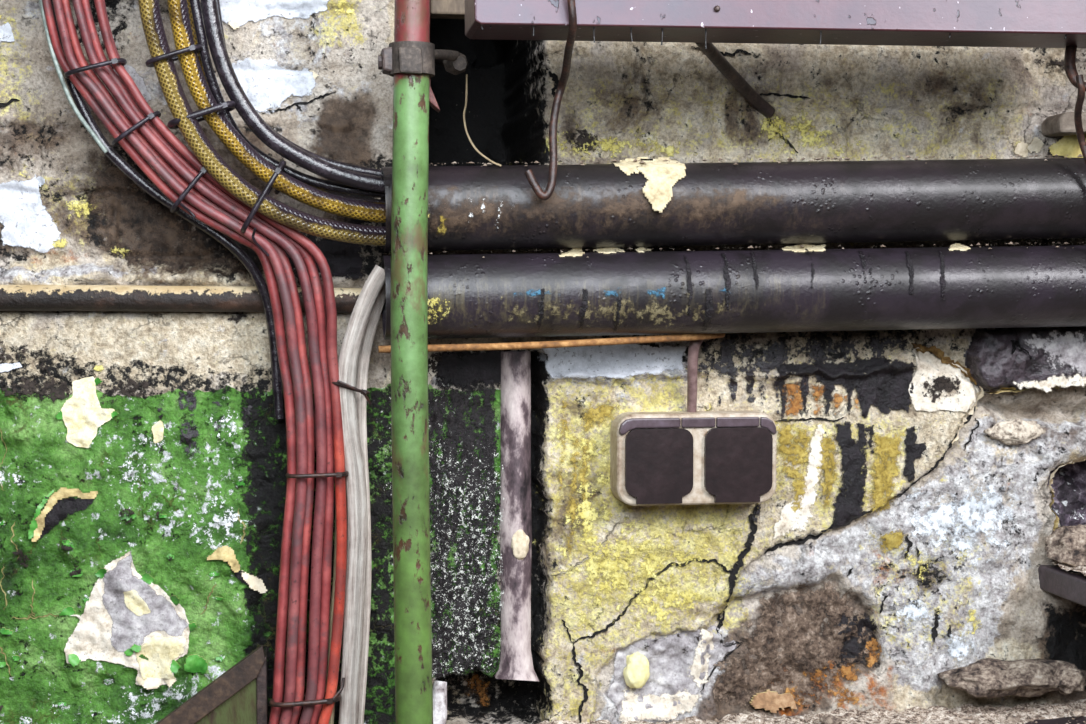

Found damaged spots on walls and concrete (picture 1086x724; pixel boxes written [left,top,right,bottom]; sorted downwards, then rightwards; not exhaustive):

peeling [219,0,329,30]
peeling [232,58,319,114]
peeling [0,175,61,253]
water stain [0,341,150,405]
water stain [106,404,165,492]
water stain [178,391,252,456]
peeling [908,326,1086,444]
water stain [188,492,246,545]
crack [552,406,993,723]
peeling [59,550,224,689]
spalling [608,578,883,722]
rust [803,637,884,706]